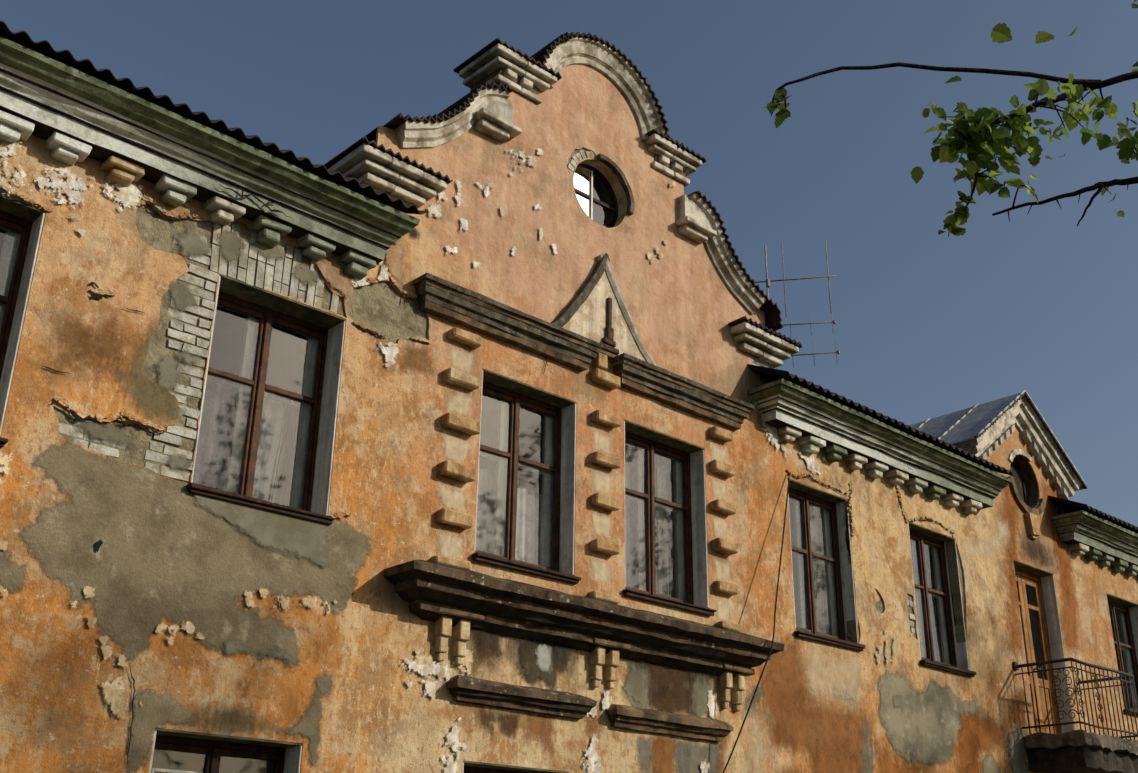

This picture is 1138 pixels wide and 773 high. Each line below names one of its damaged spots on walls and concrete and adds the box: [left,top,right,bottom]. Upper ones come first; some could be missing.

peeling [506,148,543,176]
peeling [427,180,469,232]
peeling [476,180,505,216]
flaking render [0,140,428,485]
peeling [244,588,337,614]
peeling [156,621,206,646]
peeling [70,586,143,732]
peeling [400,646,476,700]
peeling [587,690,612,719]
peeling [435,717,467,773]
peeling [582,734,601,773]